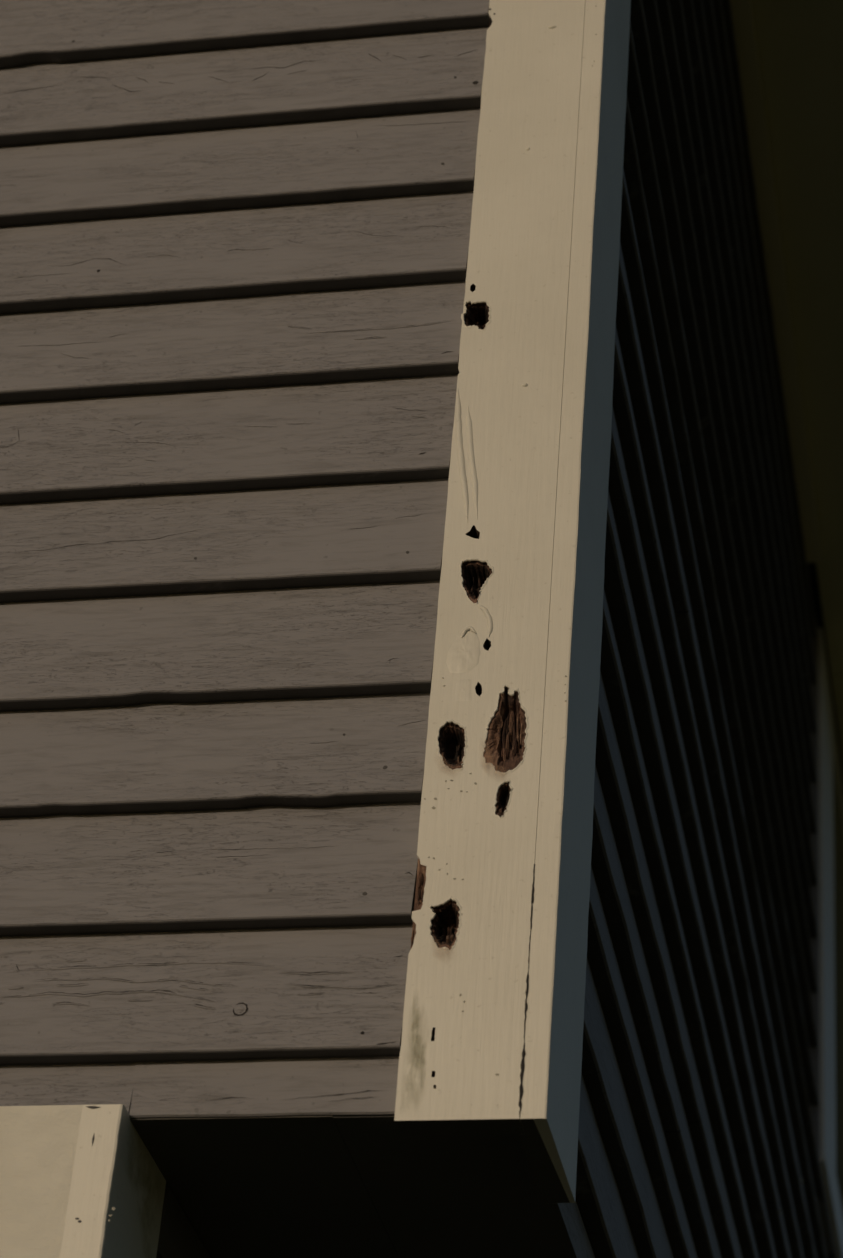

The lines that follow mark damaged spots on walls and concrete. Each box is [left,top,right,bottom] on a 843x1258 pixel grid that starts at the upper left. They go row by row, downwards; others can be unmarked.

peeling [461,300,492,332]
peeling [459,558,494,605]
peeling [424,720,477,809]
peeling [482,685,529,820]
peeling [428,896,463,952]
crack [518,864,535,1117]